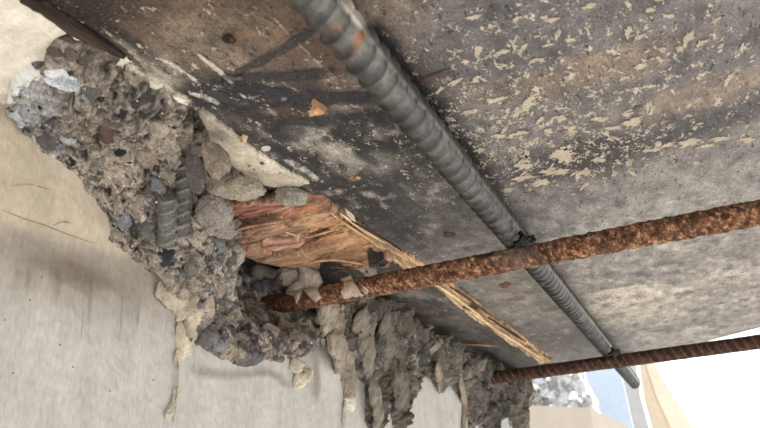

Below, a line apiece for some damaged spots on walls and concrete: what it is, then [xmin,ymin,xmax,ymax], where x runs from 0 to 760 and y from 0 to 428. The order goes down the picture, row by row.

water stain [191,29,378,126]
water stain [381,38,446,125]
peeling [447,41,483,69]
peeling [491,4,578,64]
peeling [618,24,673,92]
peeling [639,0,682,25]
peeling [675,14,727,53]
peeling [460,74,756,196]
spalling [5,34,327,367]
spalling [357,267,377,277]
spalling [340,296,601,428]